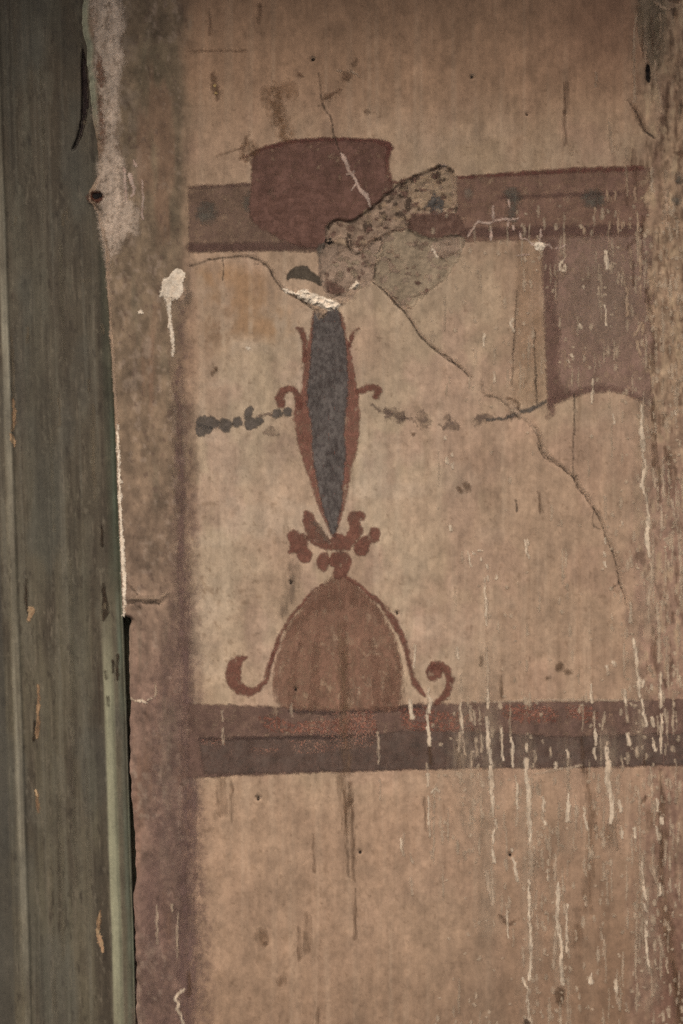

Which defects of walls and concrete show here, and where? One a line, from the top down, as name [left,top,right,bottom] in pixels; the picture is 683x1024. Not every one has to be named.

crack [324,89,372,207]
efflorescence [159,268,186,356]
flaking render [282,164,466,319]
crack [468,199,566,255]
crack [373,282,625,591]
water stain [408,687,440,837]
water stain [458,647,579,1024]